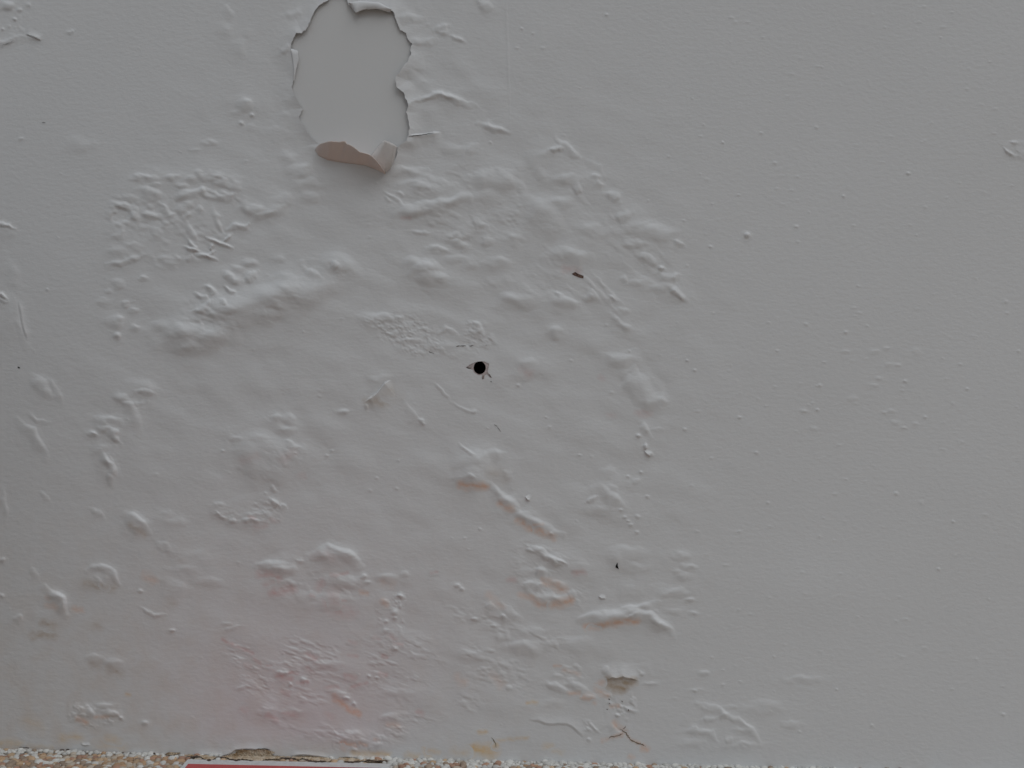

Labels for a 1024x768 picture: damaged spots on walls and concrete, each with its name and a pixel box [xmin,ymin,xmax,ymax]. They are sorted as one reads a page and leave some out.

peeling [250,0,514,183]
flaking render [165,742,393,763]